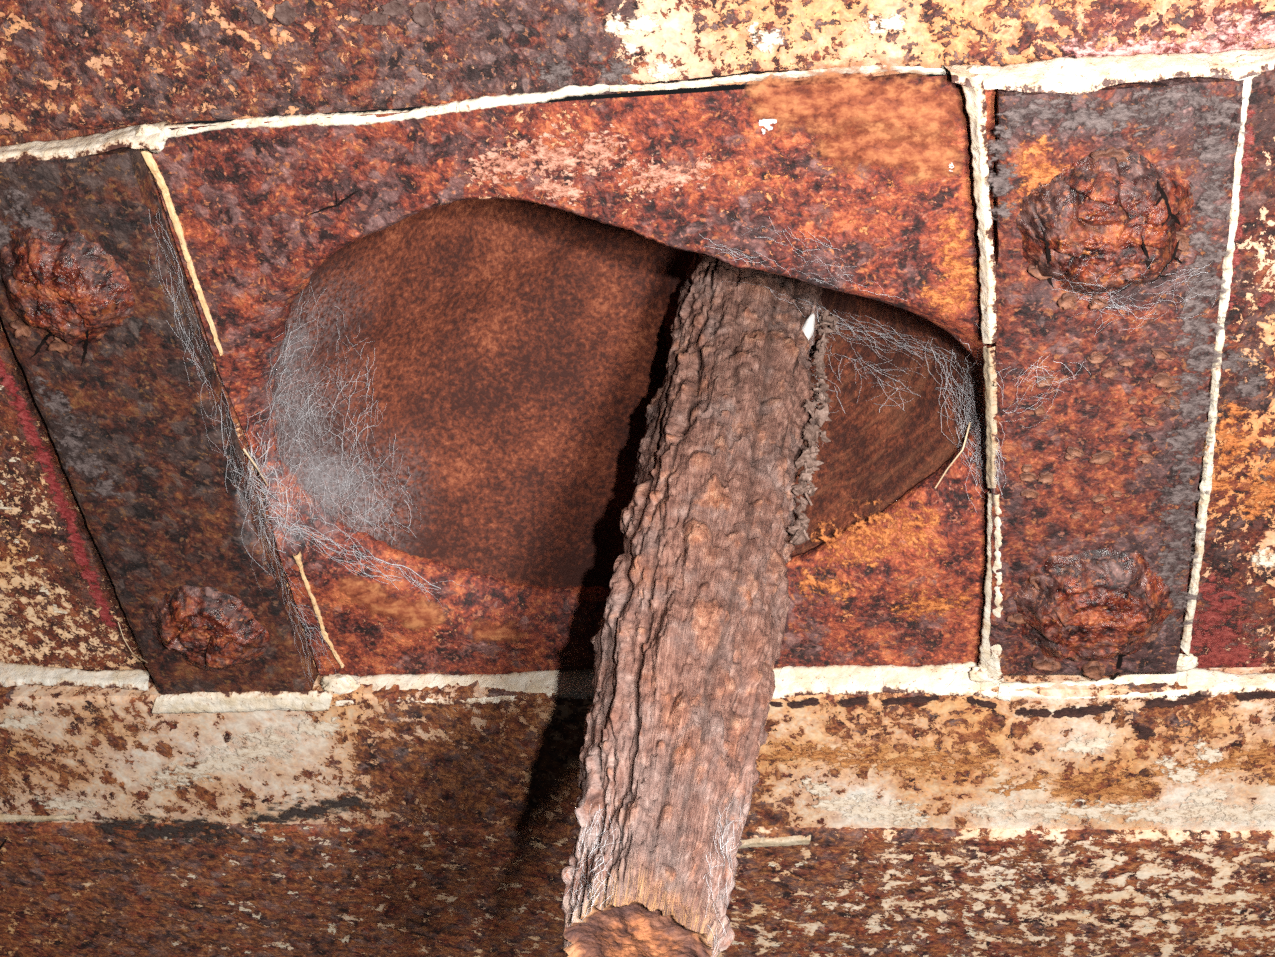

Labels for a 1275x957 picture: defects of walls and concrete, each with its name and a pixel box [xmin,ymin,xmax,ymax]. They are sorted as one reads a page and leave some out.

corrosion [746,56,967,183]
corrosion [466,124,716,206]
corrosion [1013,135,1069,210]
corrosion [921,216,980,314]
corrosion [1087,351,1136,378]
corrosion [1128,348,1183,427]
corrosion [787,310,940,602]
corrosion [1019,464,1054,498]
corrosion [1211,400,1275,520]
corrosion [340,577,445,628]
corrosion [891,589,973,621]
corrosion [1082,661,1105,682]